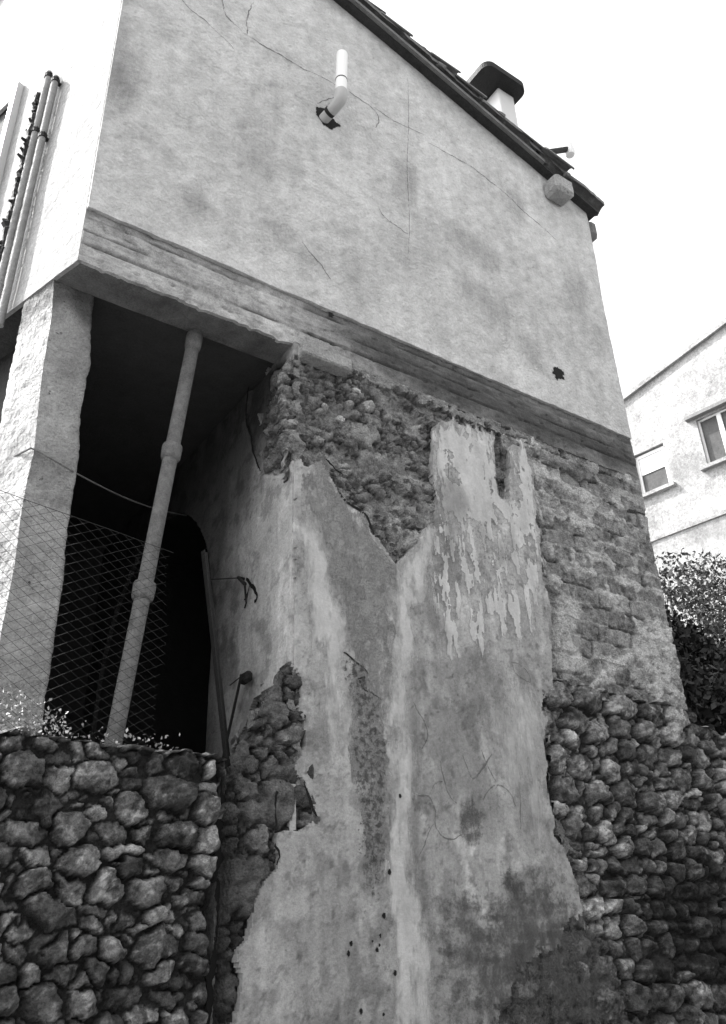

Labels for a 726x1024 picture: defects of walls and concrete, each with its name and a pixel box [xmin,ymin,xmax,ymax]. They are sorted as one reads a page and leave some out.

crack [182,0,495,253]
spalling [552,366,565,380]
spalling [257,357,546,895]
spalling [210,661,321,1024]
crack [415,705,462,848]